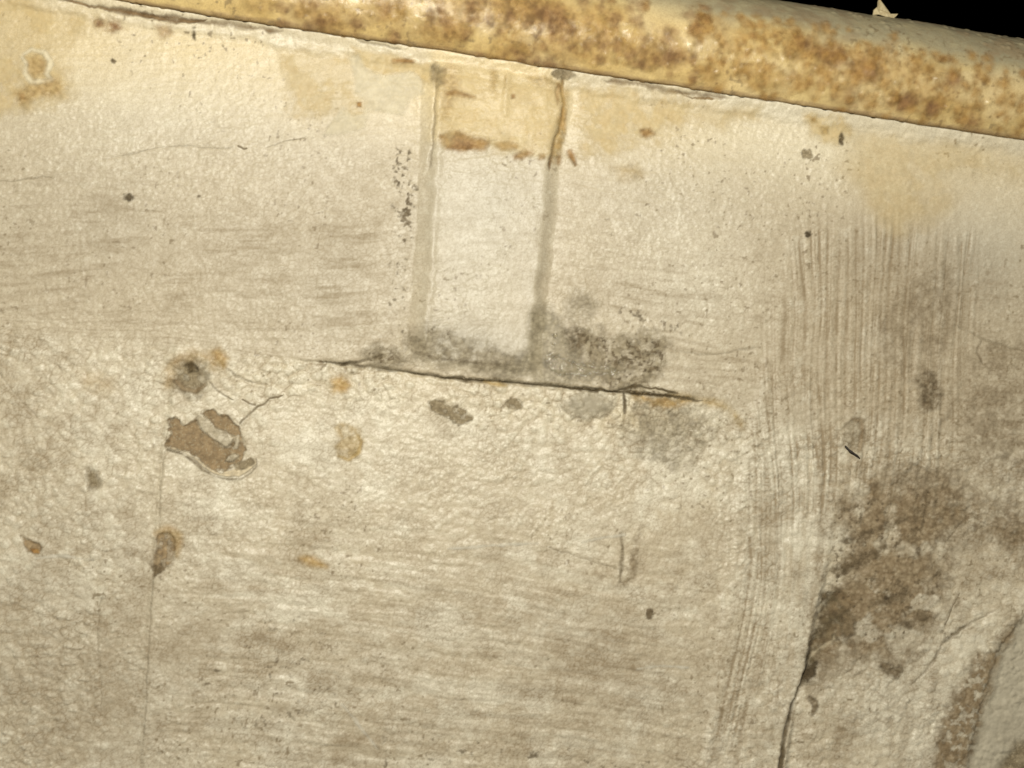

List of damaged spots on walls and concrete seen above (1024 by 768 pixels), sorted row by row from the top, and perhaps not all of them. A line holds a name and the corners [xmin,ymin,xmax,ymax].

water stain [354,51,428,109]
water stain [395,151,417,227]
water stain [373,348,404,366]
water stain [409,312,666,394]
crack [408,371,696,413]
spalling [164,409,256,480]
crack [779,668,807,768]